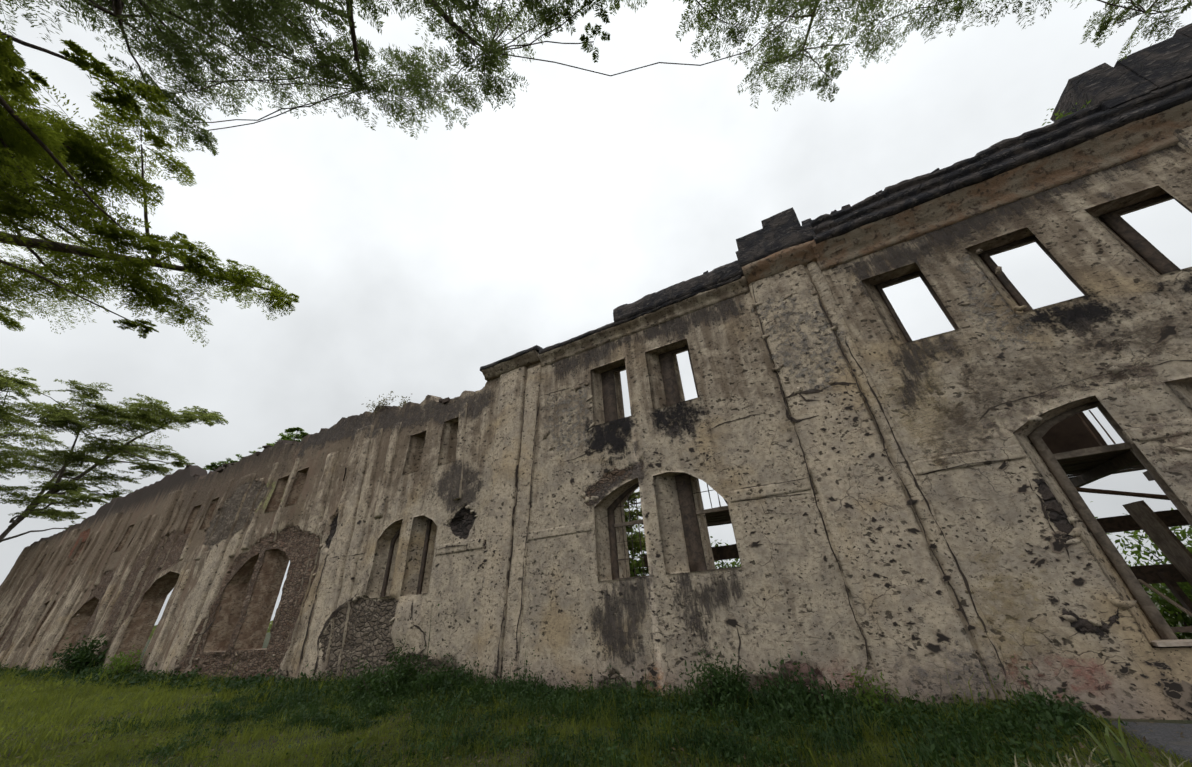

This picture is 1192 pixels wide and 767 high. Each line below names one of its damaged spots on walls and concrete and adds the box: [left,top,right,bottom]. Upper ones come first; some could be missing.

flaking render [72,530,190,652]
flaking render [203,479,272,554]
flaking render [170,512,356,681]
leakage [177,387,494,515]
flaking render [318,594,461,684]
spalling [435,504,495,577]
leakage [584,405,645,513]
leakage [588,570,655,667]
leakage [650,395,709,447]
leakage [672,570,743,657]
crack [708,285,1192,692]
leakage [889,291,1192,464]